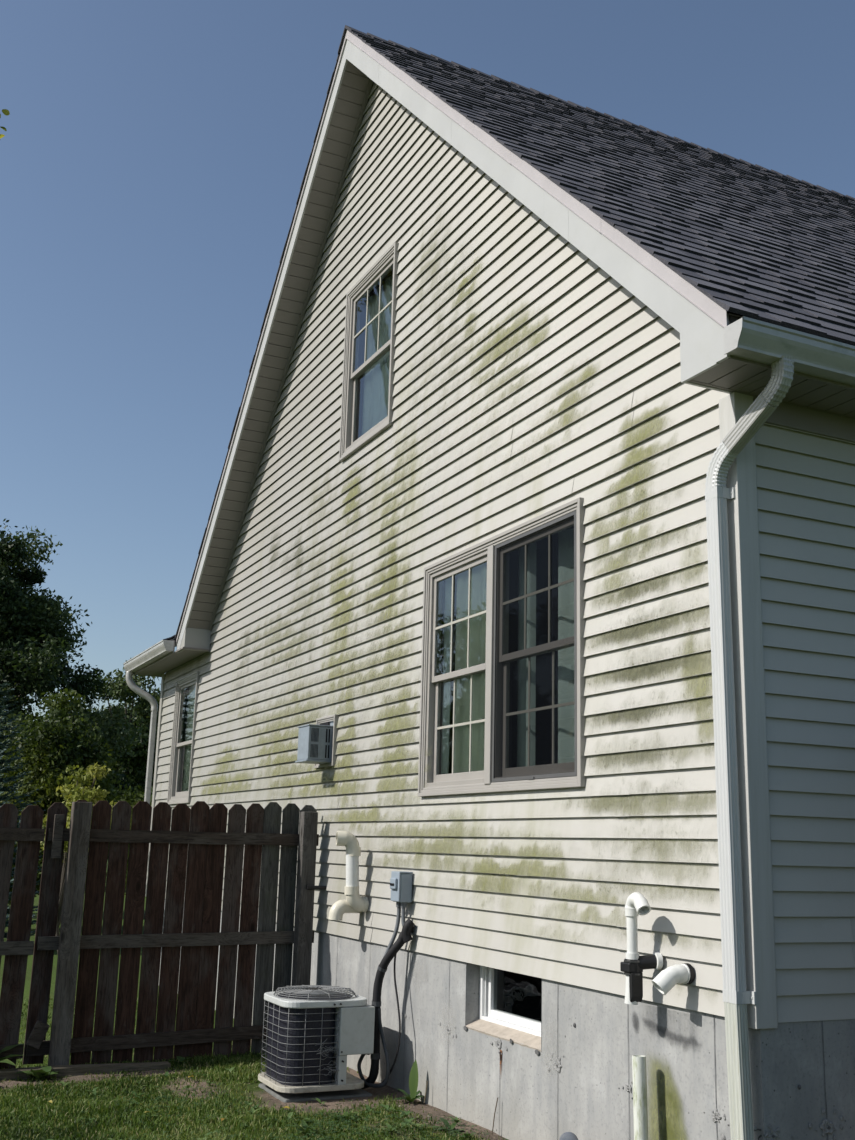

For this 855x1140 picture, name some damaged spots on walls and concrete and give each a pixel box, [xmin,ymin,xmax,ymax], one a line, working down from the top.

damp [477,316,546,385]
damp [593,408,668,599]
damp [366,474,408,674]
damp [602,608,703,641]
damp [254,551,463,866]
damp [596,647,713,734]
damp [598,750,649,761]
damp [592,793,707,818]
damp [462,847,564,893]